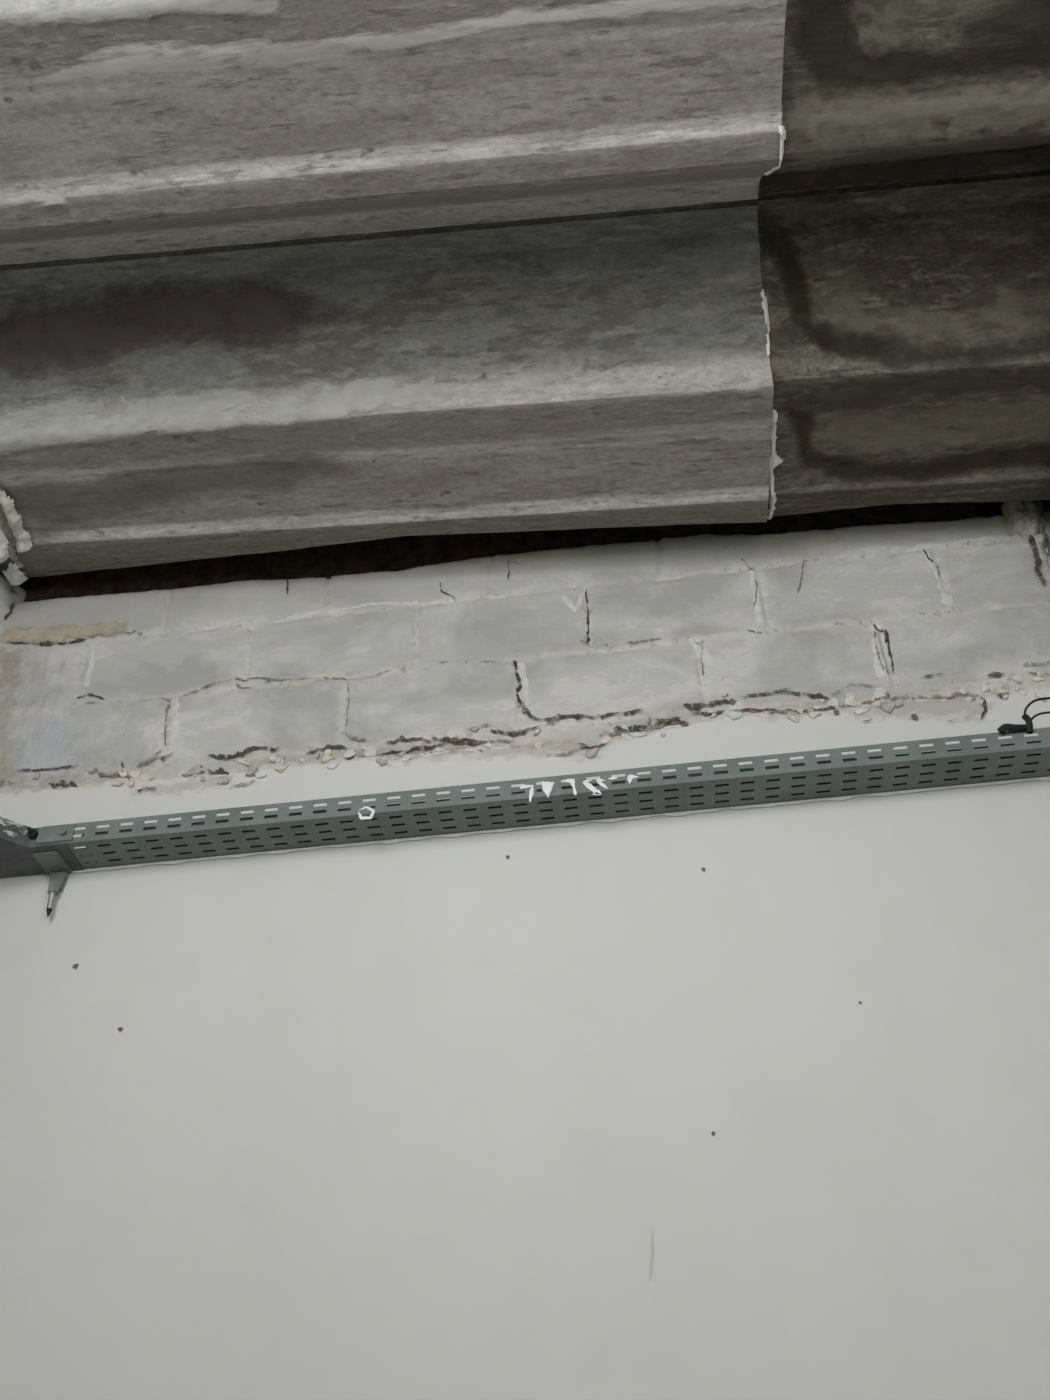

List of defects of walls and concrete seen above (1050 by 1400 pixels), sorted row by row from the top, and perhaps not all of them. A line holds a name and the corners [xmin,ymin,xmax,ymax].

damp [20,0,763,84]
damp [760,0,1050,201]
damp [0,375,557,451]
damp [592,372,760,396]
damp [763,216,1050,480]
crack [581,589,660,647]
crack [741,558,761,634]
crack [797,560,807,595]
crack [870,620,894,673]
crack [154,670,389,756]
crack [439,660,530,712]